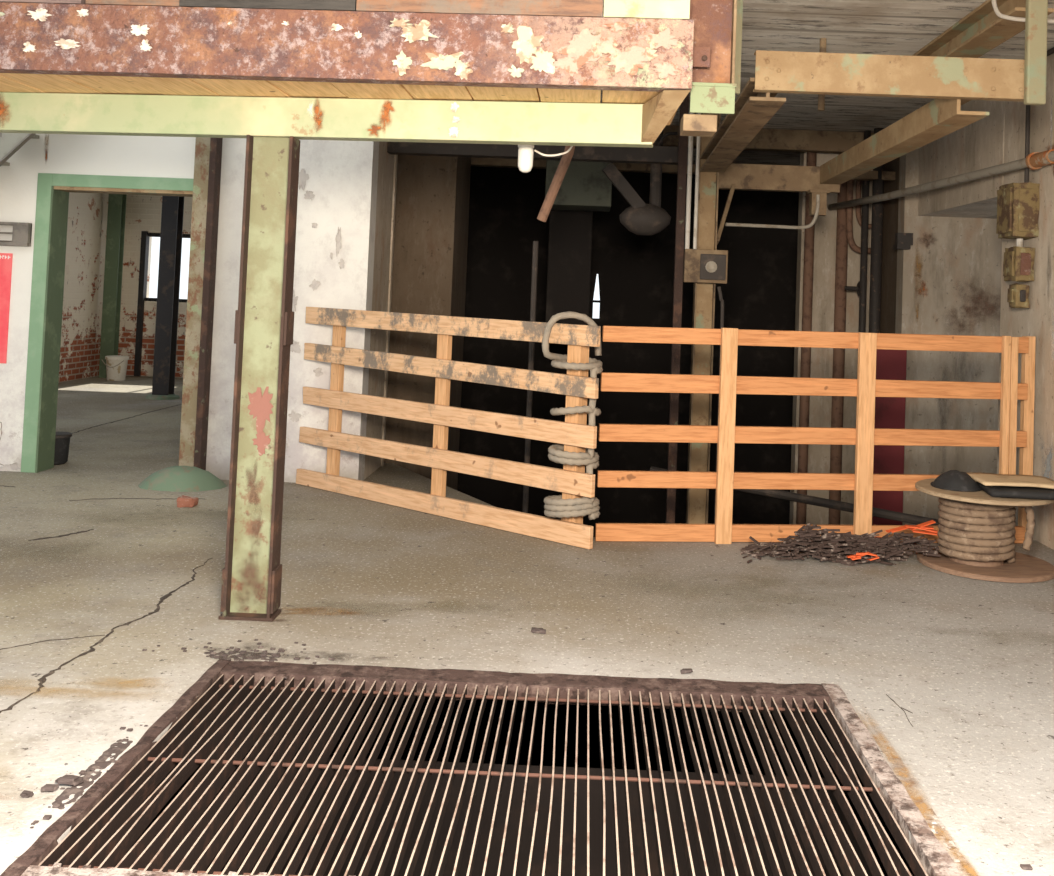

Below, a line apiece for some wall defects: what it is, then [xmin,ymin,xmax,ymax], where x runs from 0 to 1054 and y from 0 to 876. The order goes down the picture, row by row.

peeling [27,8,52,22]
peeling [54,38,80,49]
peeling [131,24,152,51]
peeling [331,23,362,39]
peeling [389,18,473,80]
rust [368,102,394,136]
peeling [248,386,274,456]
crack [0,558,212,713]